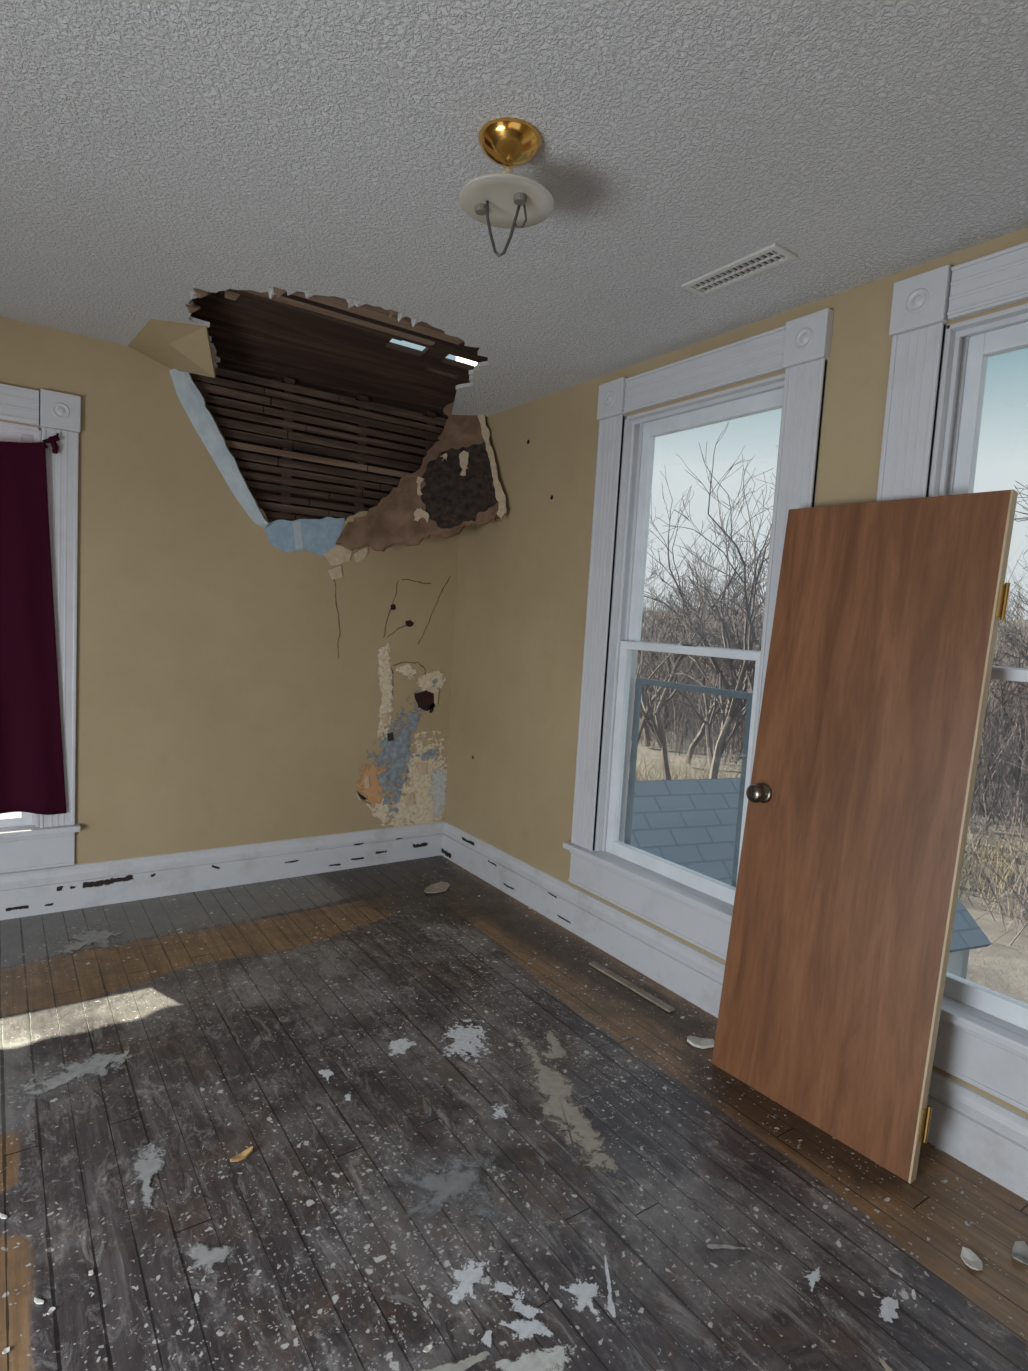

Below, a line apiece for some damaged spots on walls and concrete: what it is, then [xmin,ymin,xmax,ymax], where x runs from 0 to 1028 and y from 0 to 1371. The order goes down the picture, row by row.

peeling [169,369,368,580]
peeling [414,476,429,524]
peeling [440,451,469,476]
spalling [477,415,507,522]
peeling [329,643,451,866]